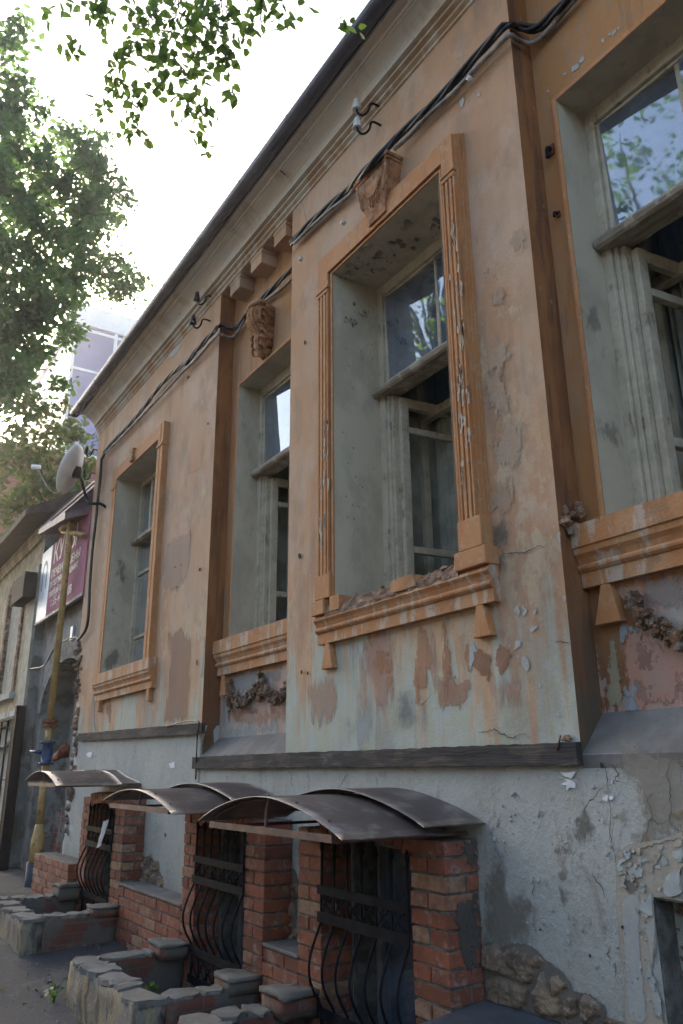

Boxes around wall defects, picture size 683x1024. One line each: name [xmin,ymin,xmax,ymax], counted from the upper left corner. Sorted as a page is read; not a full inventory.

peeling [340,217,471,485]
peeling [469,641,477,669]
peeling [606,623,640,712]
crack [584,760,681,859]
leakage [455,838,531,974]
peeling [615,832,683,1024]